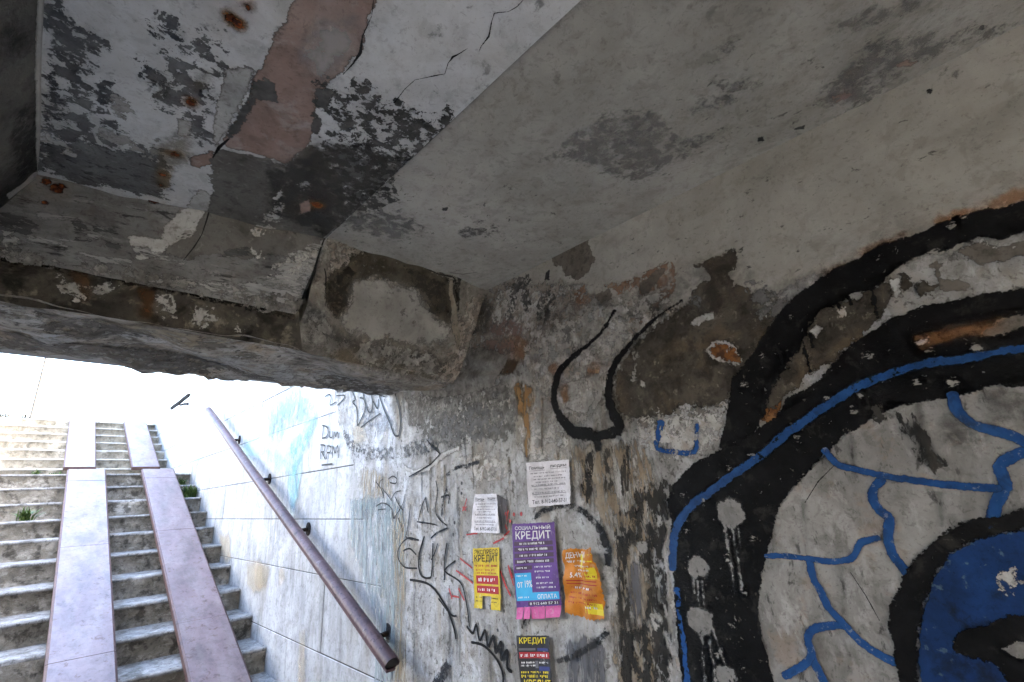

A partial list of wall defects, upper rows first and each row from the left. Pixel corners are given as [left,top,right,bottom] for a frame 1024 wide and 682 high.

corrosion [222,3,252,30]
crack [343,0,374,75]
crack [394,0,523,103]
crack [212,139,229,158]
corrosion [40,178,67,205]
crack [184,212,209,260]
peeling [0,0,796,486]
damp [307,251,461,372]
corrosion [513,382,543,458]
damp [565,438,691,682]